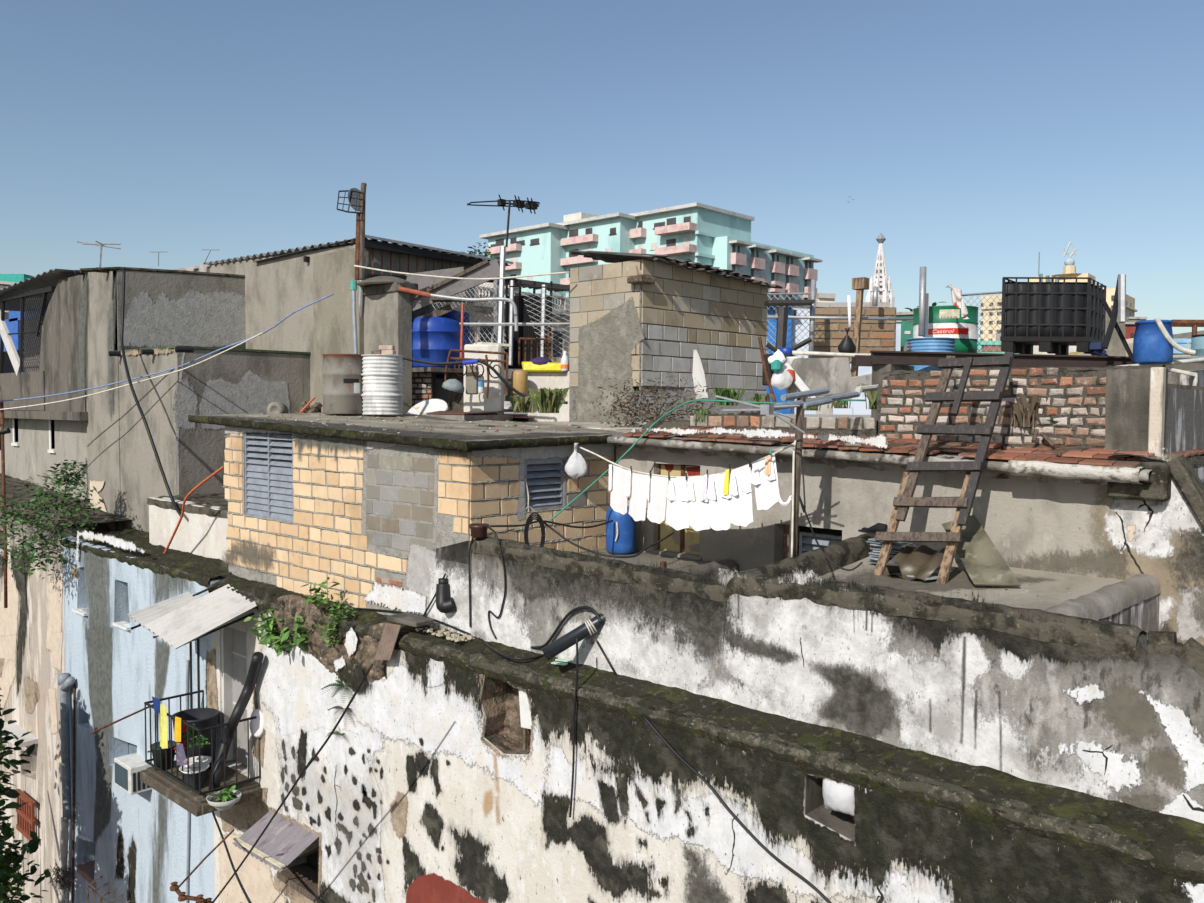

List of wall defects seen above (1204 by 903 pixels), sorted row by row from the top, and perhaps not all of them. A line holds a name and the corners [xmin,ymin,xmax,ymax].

leakage [0,543,30,698]
flaking render [205,648,220,725]
mould [280,729,389,903]
mould [402,836,426,892]
mould [406,738,509,903]
peeling [218,563,954,903]
leakage [508,664,1197,903]
leakage [776,569,1149,737]
crack [1115,501,1154,574]
peeling [1102,478,1204,560]
peeling [1159,596,1177,627]
peeling [1138,690,1204,824]